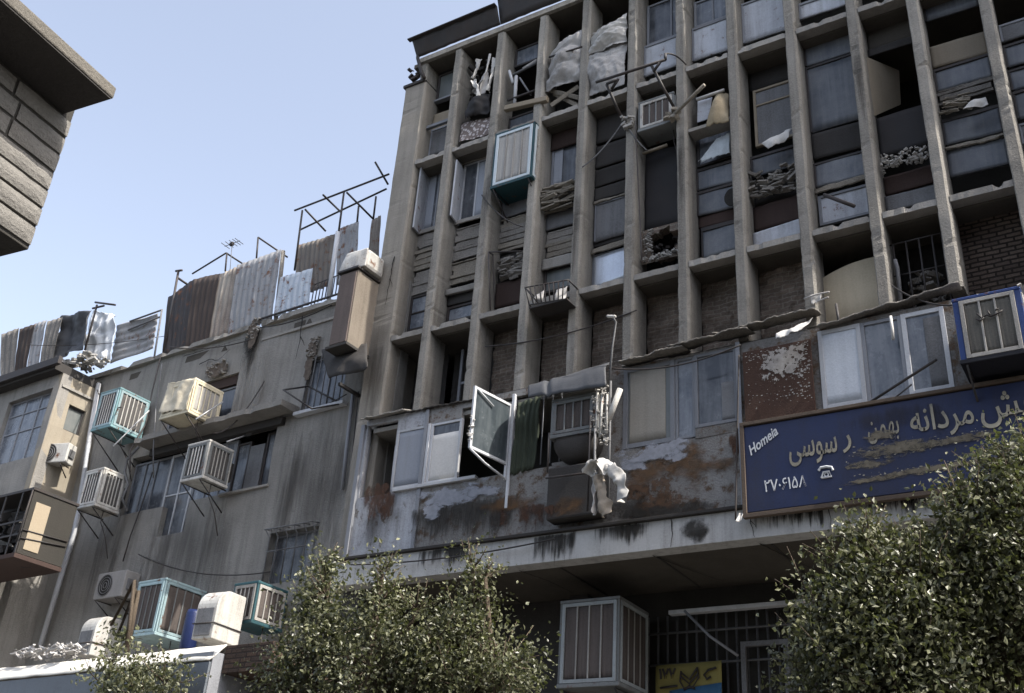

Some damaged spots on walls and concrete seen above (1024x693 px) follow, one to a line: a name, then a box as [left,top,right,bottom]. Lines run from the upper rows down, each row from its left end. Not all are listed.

peeling [745,342,812,409]
corrosion [361,483,395,525]
peeling [419,478,500,520]
corrosion [490,496,544,527]
damp [595,499,713,543]
damp [534,532,575,559]